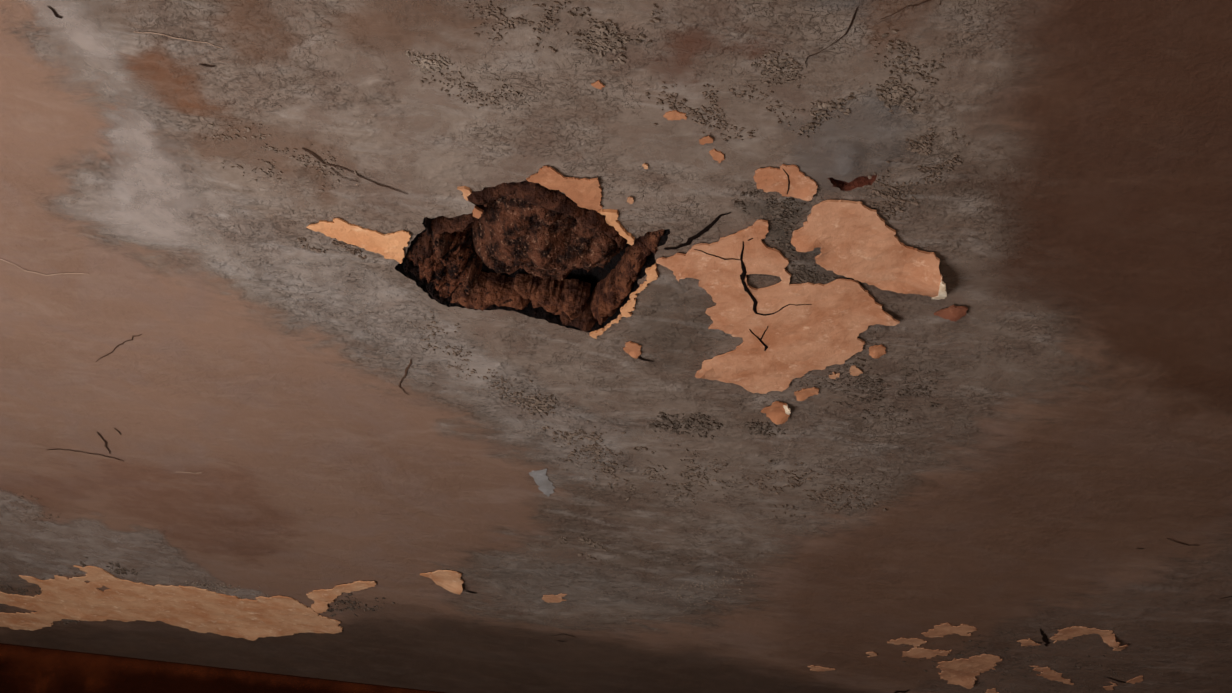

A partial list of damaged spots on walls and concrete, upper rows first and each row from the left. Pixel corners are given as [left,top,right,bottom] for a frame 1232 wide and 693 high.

crack [805,0,931,68]
crack [664,212,731,250]
damp [746,274,782,289]
peeling [297,128,968,522]
damp [0,491,260,598]
peeling [0,557,395,641]
peeling [420,570,464,595]
peeling [887,623,1002,693]
peeling [1030,666,1074,685]
peeling [1017,626,1128,651]